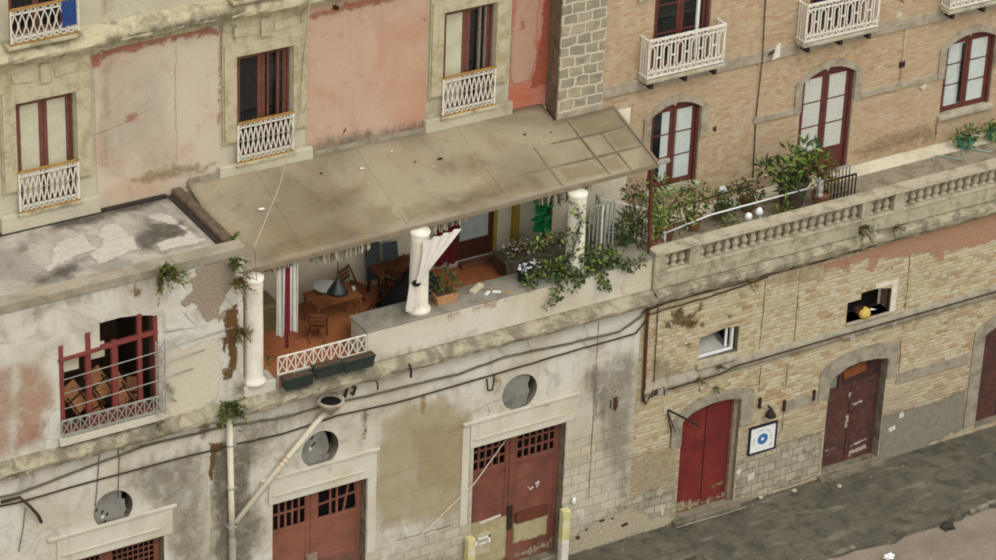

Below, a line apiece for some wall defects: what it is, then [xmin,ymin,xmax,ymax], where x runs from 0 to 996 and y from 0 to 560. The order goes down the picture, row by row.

peeling [531,0,550,88]
damp [39,195,207,282]
peeling [814,215,996,273]
spalling [181,261,239,380]
peeling [471,515,553,560]